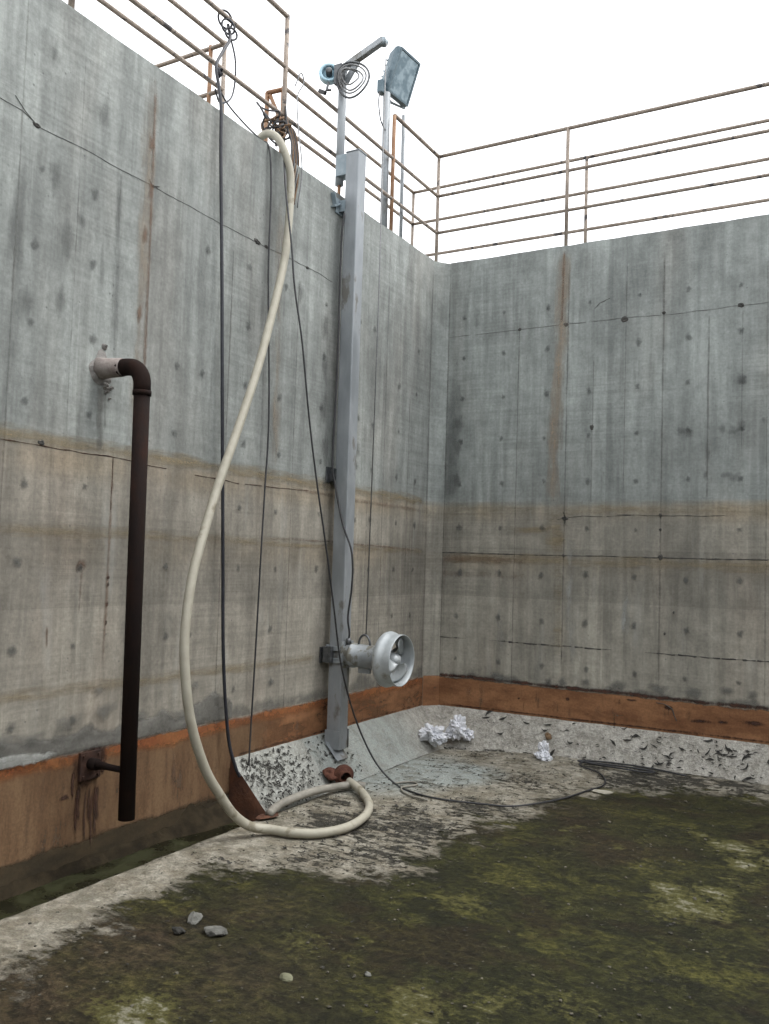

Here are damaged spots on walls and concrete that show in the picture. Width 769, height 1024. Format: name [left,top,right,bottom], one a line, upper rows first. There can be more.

rust [347,673,769,745]
rust [0,698,328,867]
water stain [0,793,229,887]